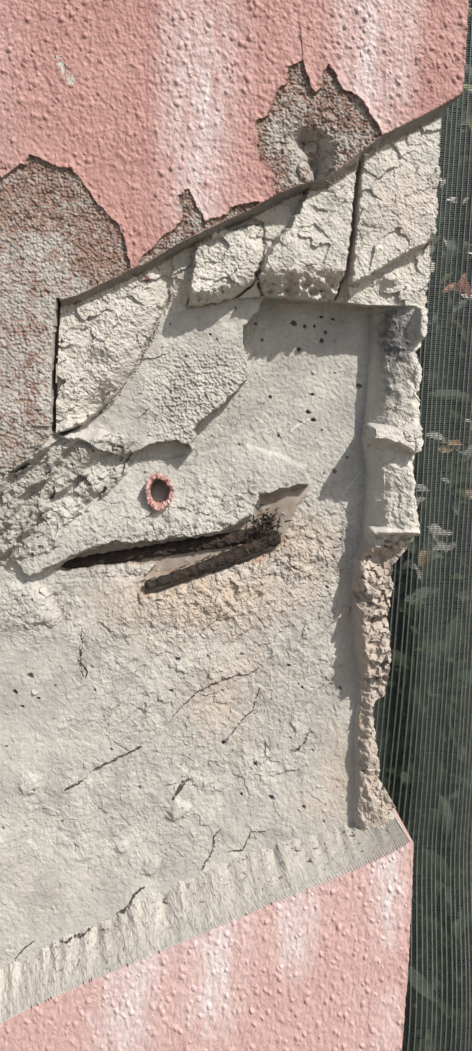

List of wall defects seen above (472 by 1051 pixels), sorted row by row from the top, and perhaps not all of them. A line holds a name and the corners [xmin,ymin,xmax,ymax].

peeling [55,50,75,85]
peeling [255,60,382,191]
spalling [56,117,442,434]
rust [44,502,355,737]
spalling [0,154,410,1024]